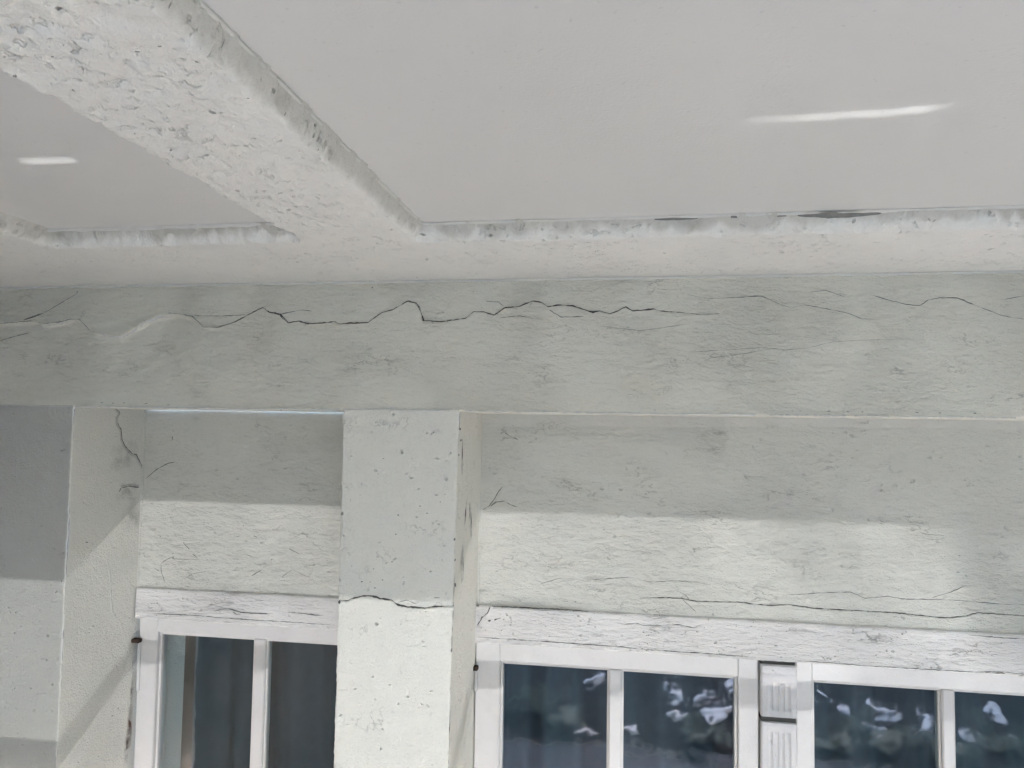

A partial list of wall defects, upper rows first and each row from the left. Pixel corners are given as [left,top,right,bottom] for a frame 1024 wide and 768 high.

crack [194,290,883,357]
crack [874,295,1022,319]
crack [115,409,174,492]
crack [149,577,1024,658]